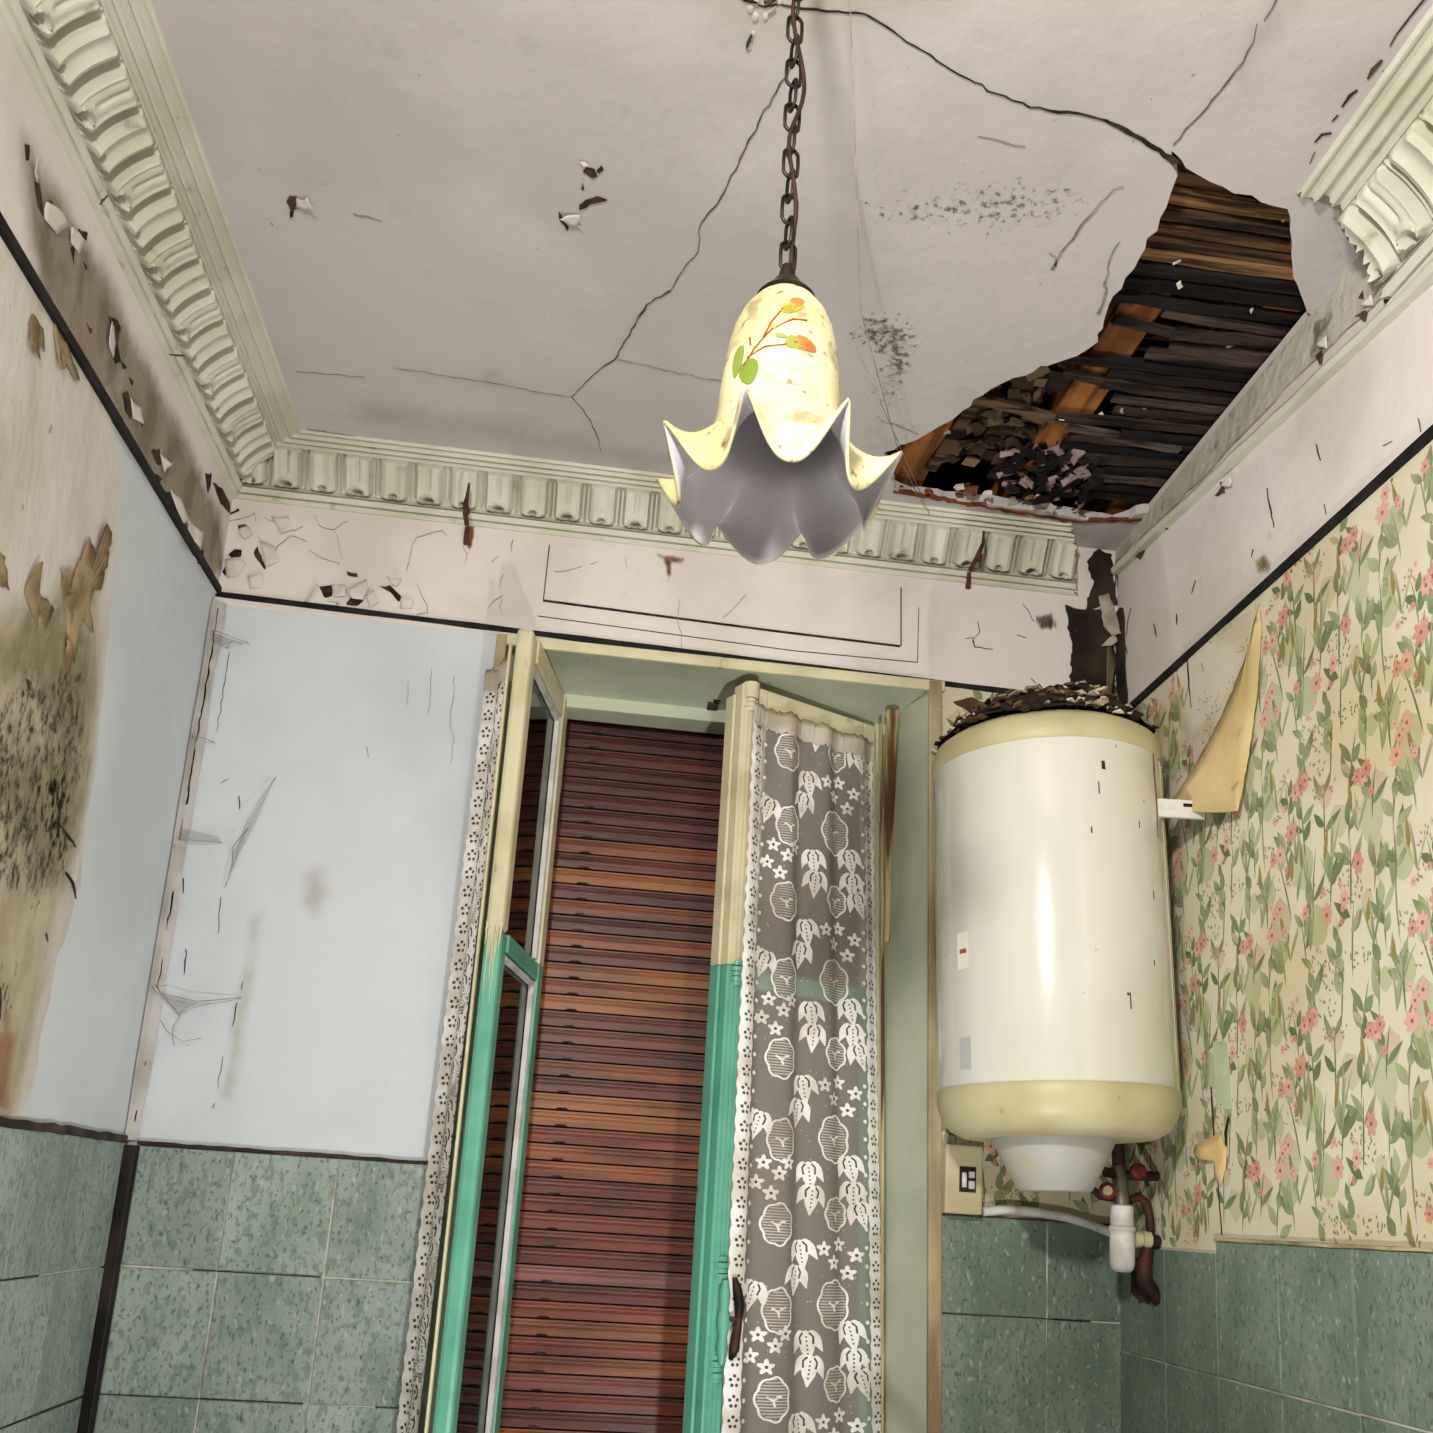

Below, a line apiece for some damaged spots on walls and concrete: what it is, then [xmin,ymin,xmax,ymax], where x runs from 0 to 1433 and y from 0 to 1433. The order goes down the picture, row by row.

crack [743,0,1277,166]
crack [1310,0,1425,163]
peeling [24,144,88,270]
crack [296,68,790,450]
peeling [559,161,607,231]
flaking render [942,361,1069,479]
spalling [893,489,1142,523]
peeling [304,571,414,609]
spalling [1065,549,1128,706]
crack [179,609,218,840]
damp [0,595,95,1106]
crack [157,891,174,987]